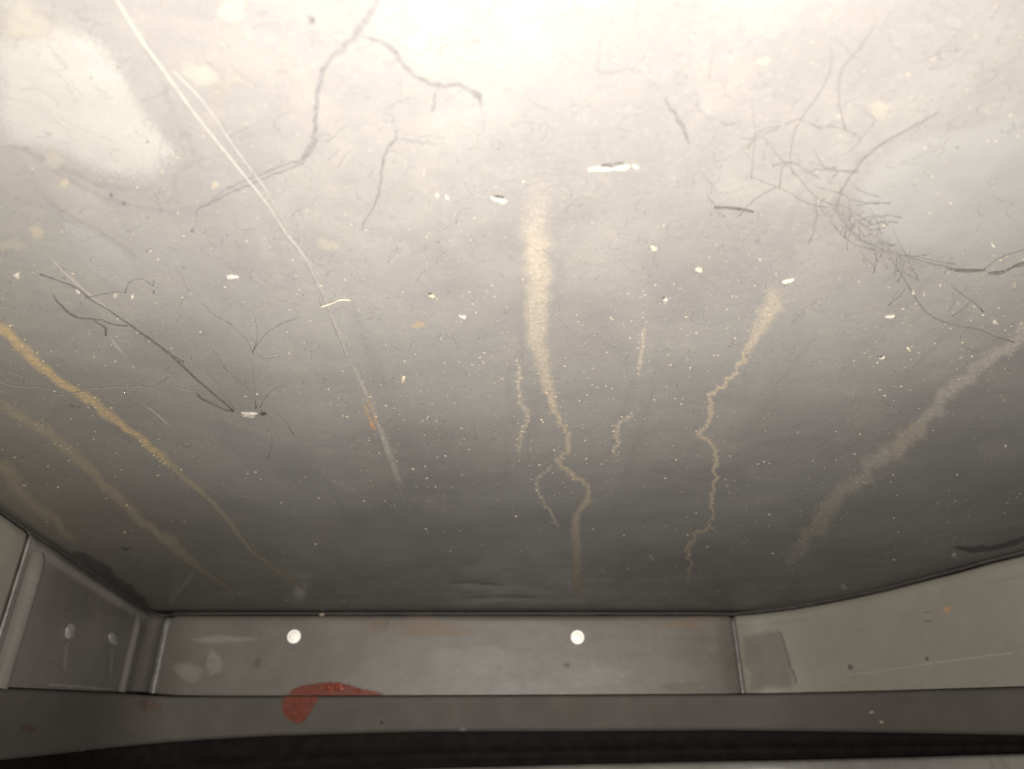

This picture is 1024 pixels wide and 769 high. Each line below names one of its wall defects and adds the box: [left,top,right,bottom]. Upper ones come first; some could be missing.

crack [196,0,486,213]
crack [361,127,446,230]
damp [0,391,242,609]
damp [510,163,593,602]
damp [683,266,798,595]
damp [779,318,1024,585]